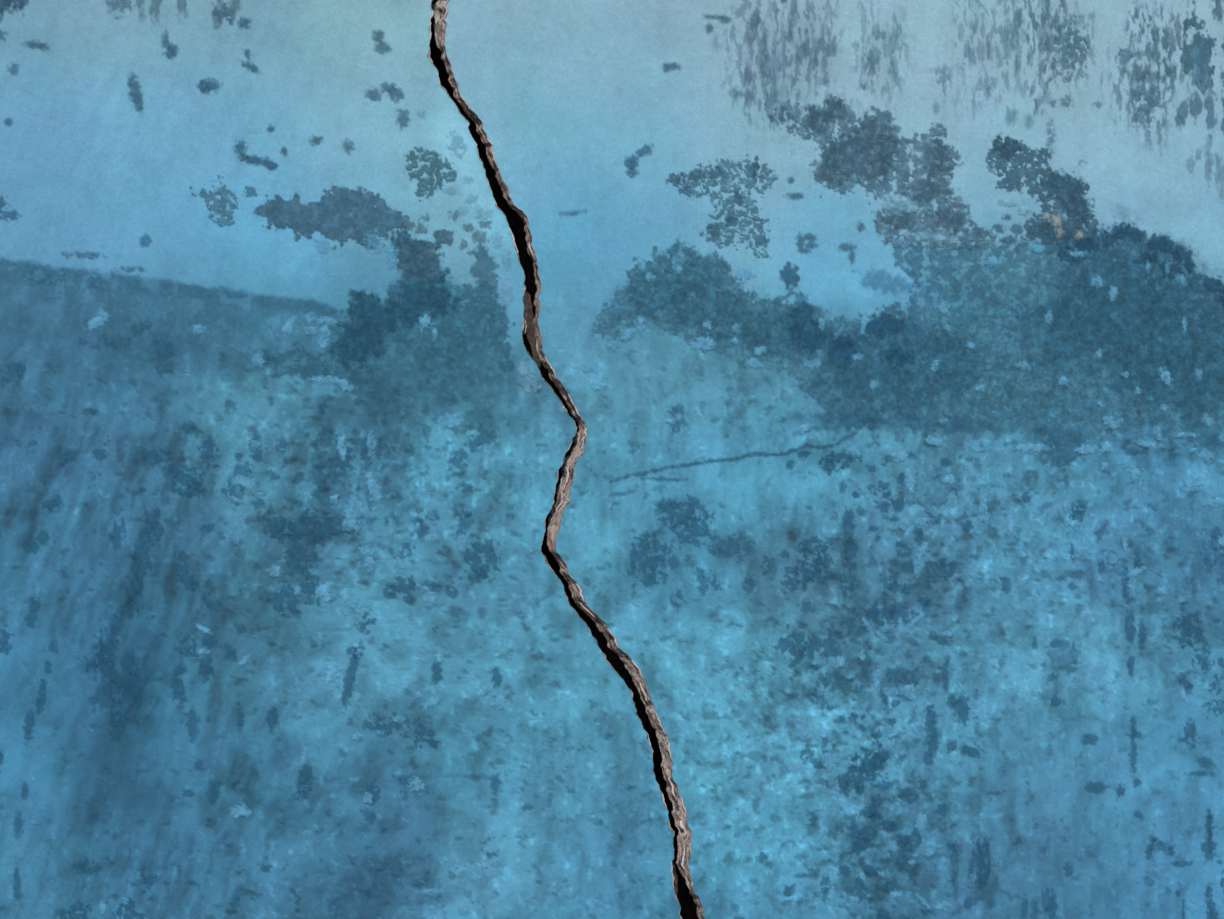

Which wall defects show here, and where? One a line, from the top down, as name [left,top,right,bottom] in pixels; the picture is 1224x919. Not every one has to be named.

mould [373,31,390,53]
mould [1046,16,1088,82]
mould [367,83,407,126]
water stain [235,142,286,170]
water stain [406,146,456,201]
water stain [0,176,514,403]
water stain [592,79,1224,465]
crack [427,0,705,919]
crack [641,442,839,475]
water stain [342,648,361,705]